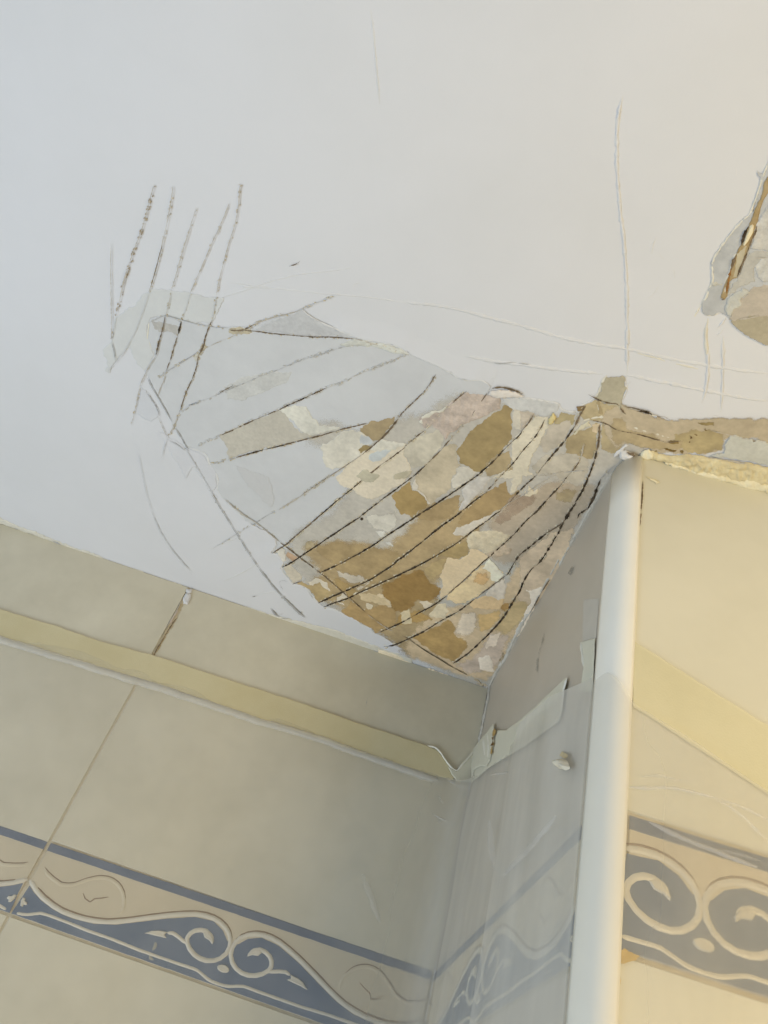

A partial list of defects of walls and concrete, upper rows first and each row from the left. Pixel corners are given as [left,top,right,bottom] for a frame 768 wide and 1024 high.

peeling [103,289,645,689]
crack [109,185,679,675]
peeling [701,163,768,345]